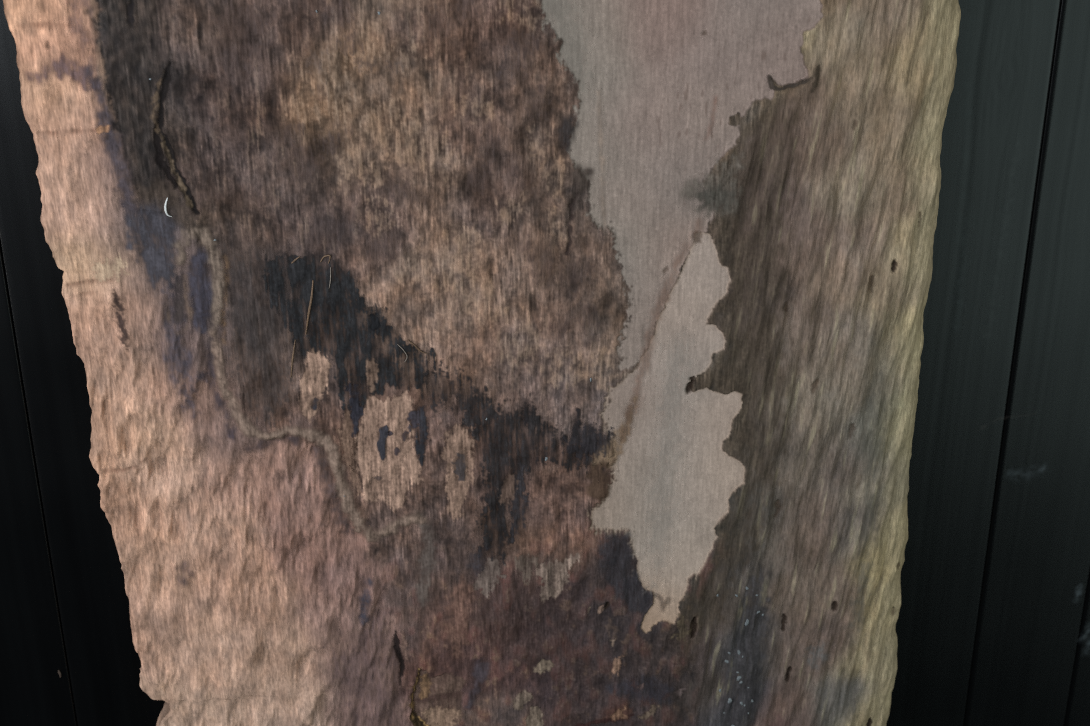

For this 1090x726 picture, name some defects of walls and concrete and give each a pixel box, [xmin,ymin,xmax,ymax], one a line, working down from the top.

crack [140,62,199,219]
damp [28,55,436,603]
damp [264,255,636,570]
peeling [542,0,823,633]